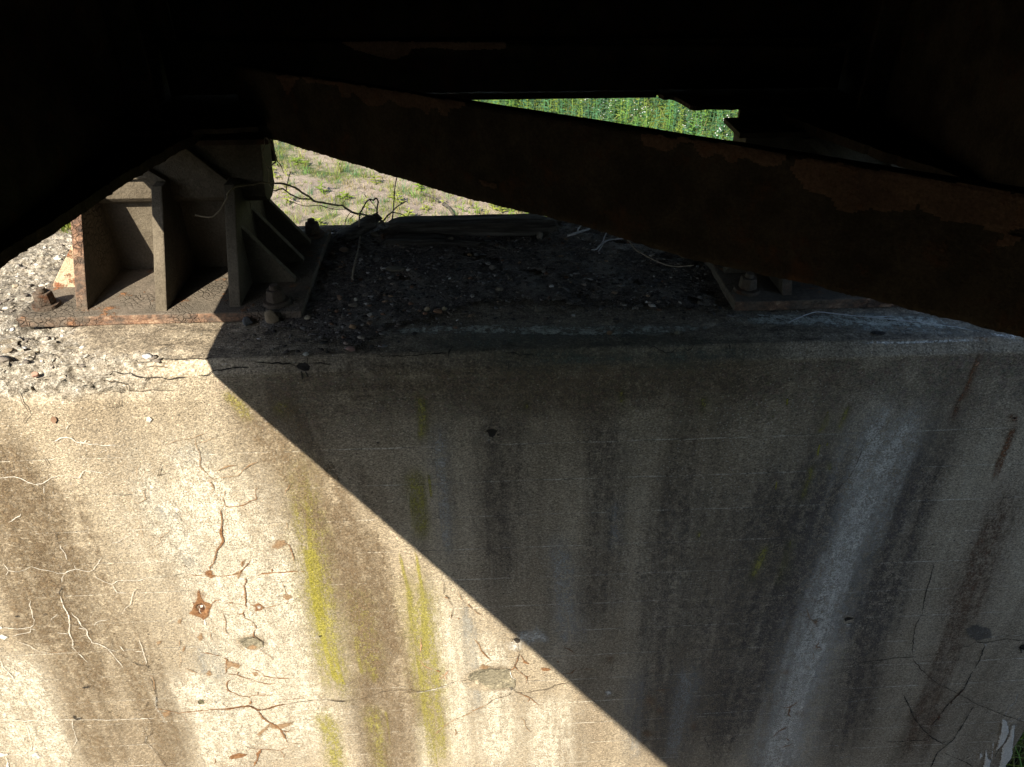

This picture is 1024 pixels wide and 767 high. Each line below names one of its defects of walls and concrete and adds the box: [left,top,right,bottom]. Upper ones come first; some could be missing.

rust [790,158,1024,234]
rust [178,590,220,641]
crack [0,424,473,767]
leakage [0,394,575,767]
crack [436,655,604,735]
crack [769,564,1023,766]